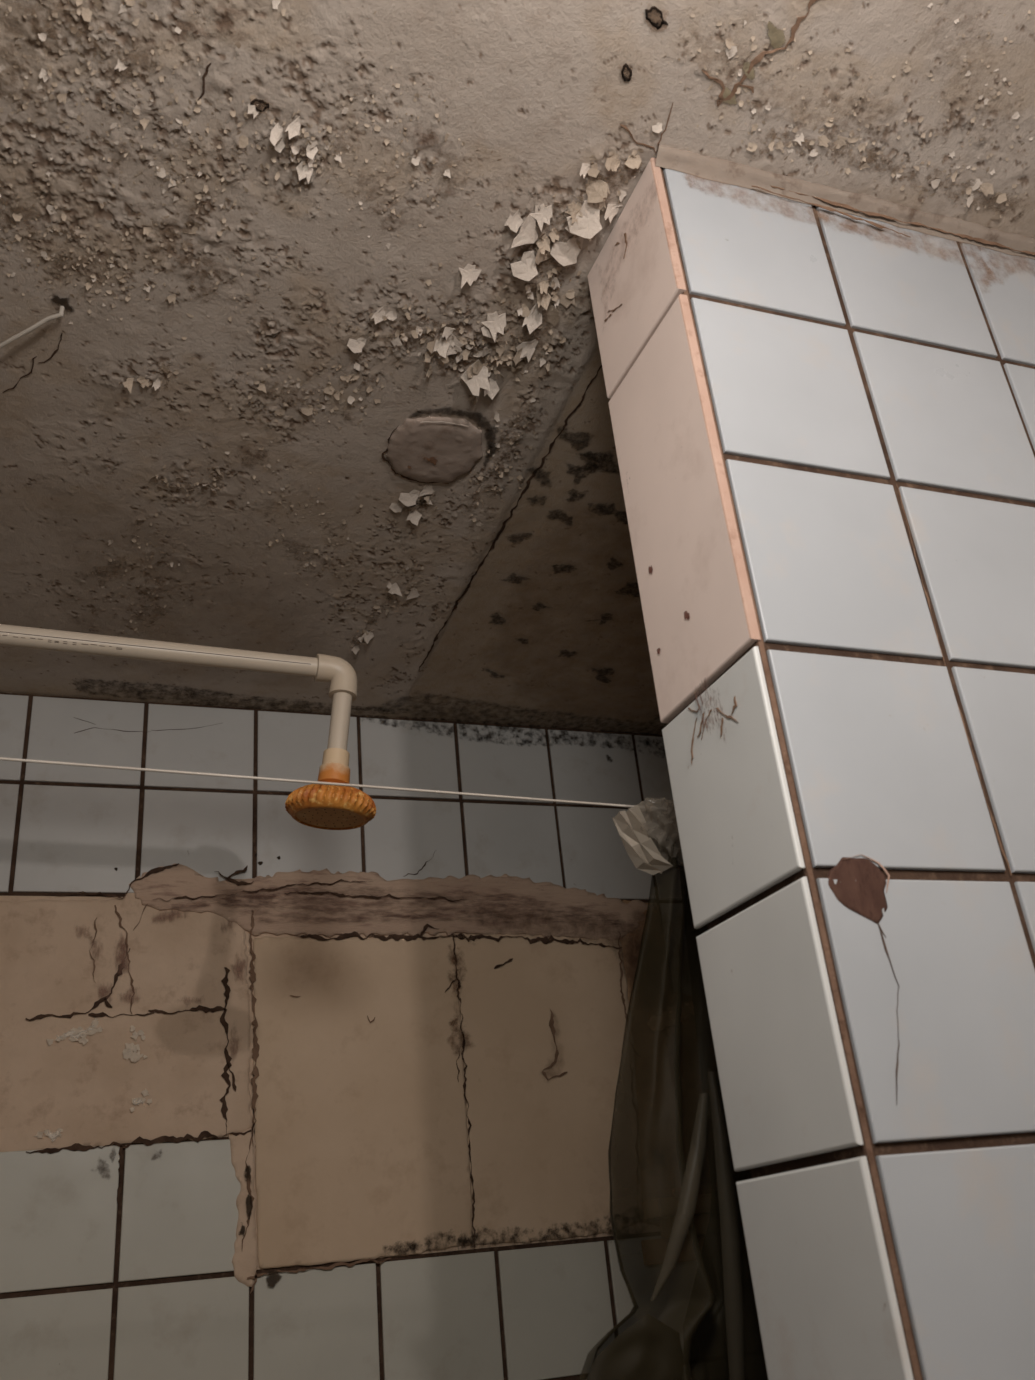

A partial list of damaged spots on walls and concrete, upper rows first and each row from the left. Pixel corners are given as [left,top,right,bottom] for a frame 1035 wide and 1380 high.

peeling [0,0,502,340]
spalling [621,63,641,82]
crack [702,69,754,106]
peeling [641,1,1035,220]
peeling [119,358,178,393]
peeling [229,122,662,530]
peeling [149,438,354,586]
leakage [528,428,628,525]
leakage [617,583,640,597]
flaking render [0,864,648,1287]
crack [26,852,627,1294]
leakage [384,1222,613,1253]